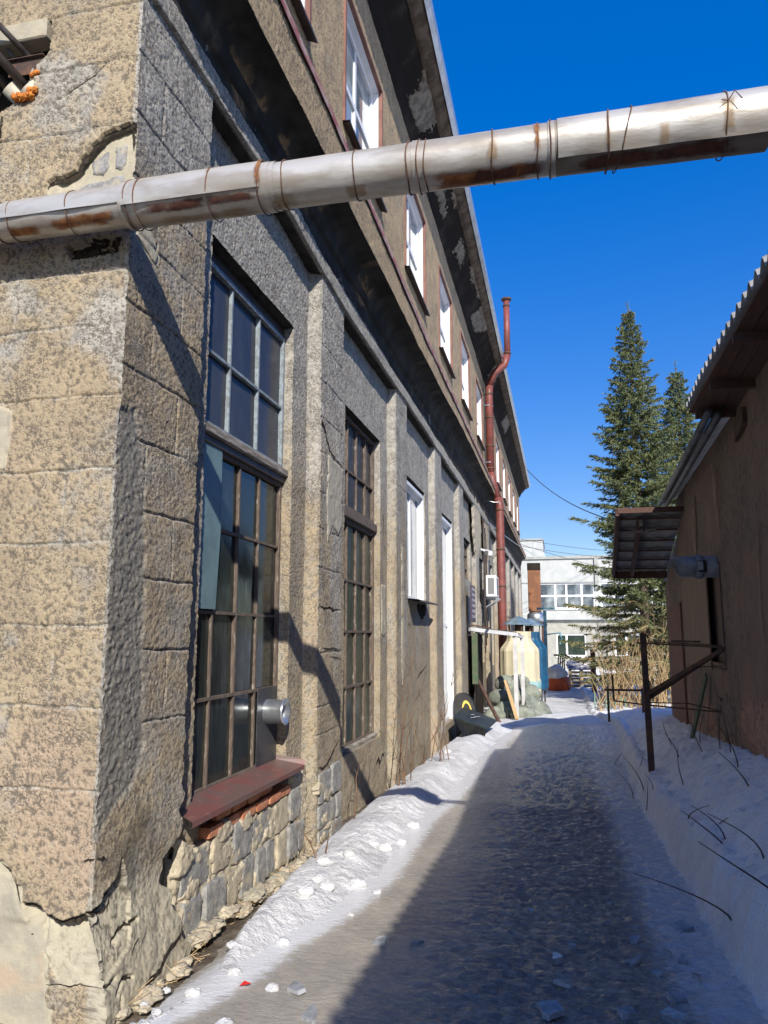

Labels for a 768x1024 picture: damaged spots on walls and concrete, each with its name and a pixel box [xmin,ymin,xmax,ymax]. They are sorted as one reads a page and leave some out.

peeling [406,69,437,134]
spalling [80,145,128,190]
corrosion [438,163,540,189]
corrosion [580,140,734,170]
corrosion [148,192,253,213]
corrosion [9,227,38,236]
corrosion [51,212,112,229]
peeling [0,869,50,1024]